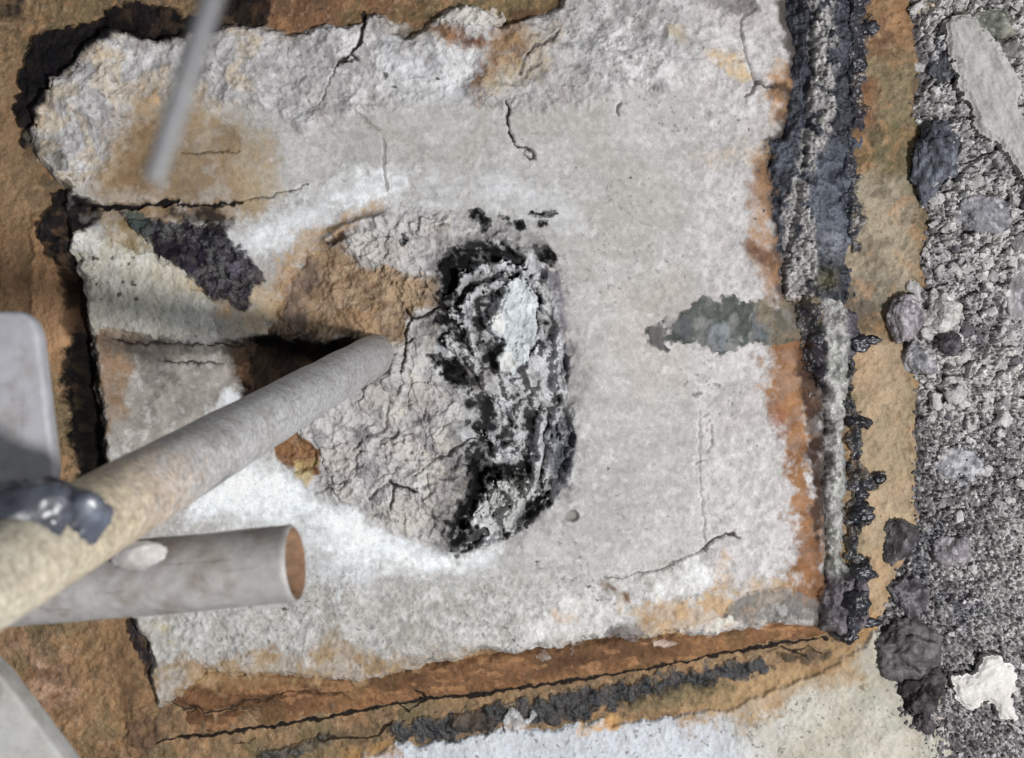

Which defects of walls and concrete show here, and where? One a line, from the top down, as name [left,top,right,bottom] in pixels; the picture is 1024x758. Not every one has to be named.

crack [318,11,367,105]
crack [505,100,536,161]
crack [74,184,306,211]
rust [213,194,391,339]
spalling [263,199,599,566]
rust [598,340,835,648]
rust [150,615,487,712]
rust [336,738,404,758]
crack [155,635,829,745]
rust [574,712,634,741]
rust [659,622,879,743]